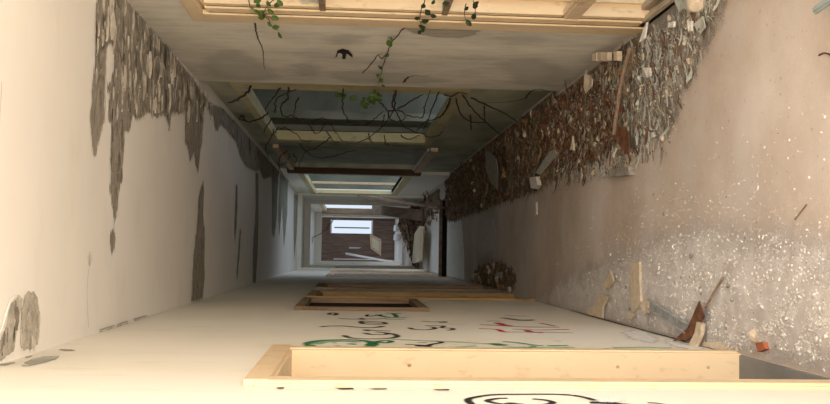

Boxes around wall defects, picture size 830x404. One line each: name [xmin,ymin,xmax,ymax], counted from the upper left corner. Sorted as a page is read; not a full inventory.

peeling [91,0,279,223]
peeling [0,291,73,366]